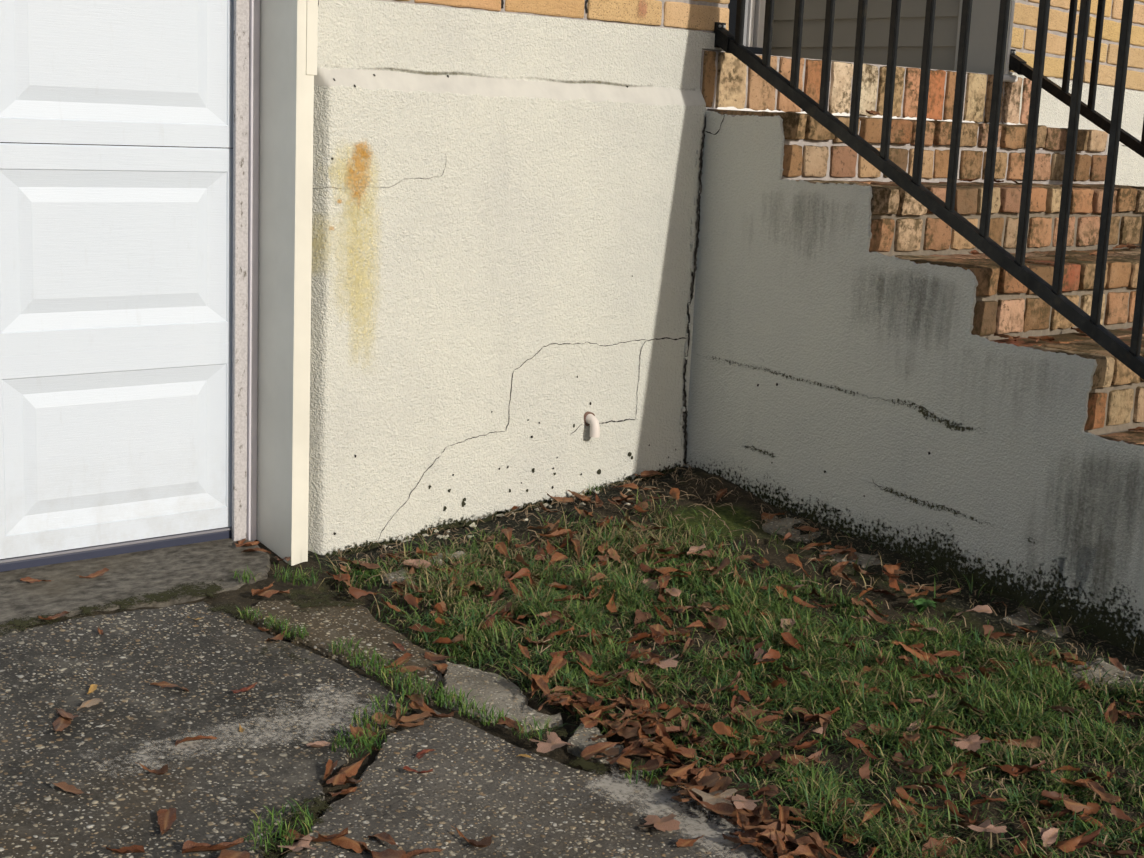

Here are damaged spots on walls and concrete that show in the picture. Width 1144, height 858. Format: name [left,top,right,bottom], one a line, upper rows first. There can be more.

rust [348,144,368,189]
crack [378,115,986,540]
crack [873,482,1041,544]